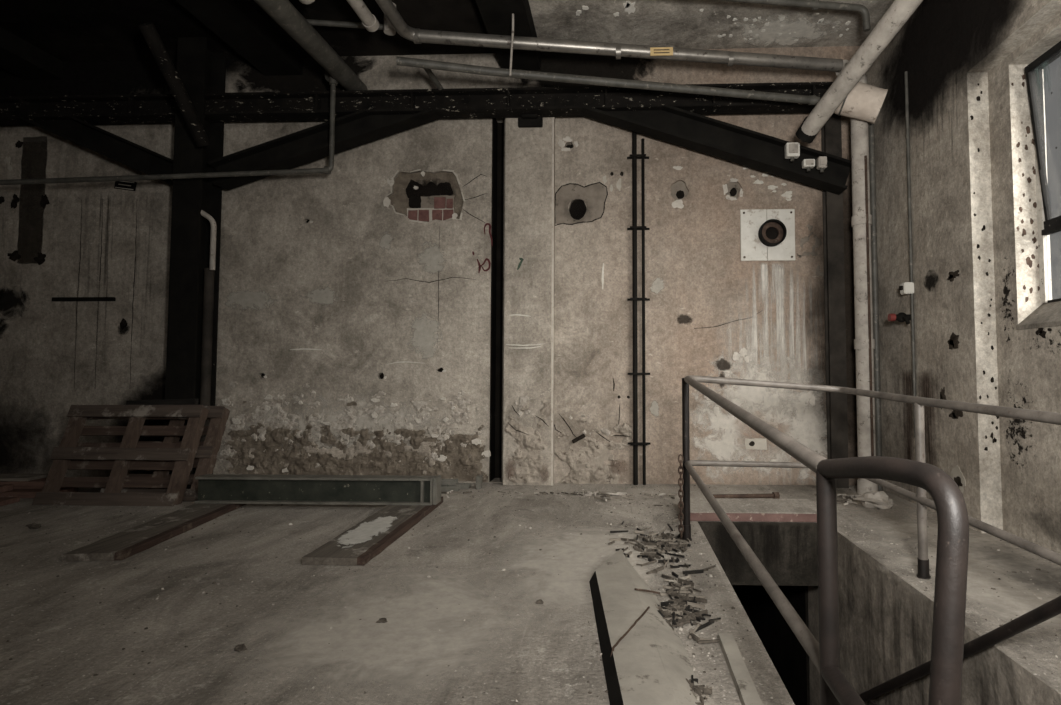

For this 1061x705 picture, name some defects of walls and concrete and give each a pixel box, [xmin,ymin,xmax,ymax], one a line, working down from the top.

spalling [383,169,486,223]
leakage [0,289,26,335]
leakage [694,228,827,479]
leakage [843,183,858,457]
leakage [999,258,1016,342]
leakage [1030,328,1061,352]
peeling [217,376,491,482]
peeling [505,395,632,484]
leakage [1006,379,1035,474]